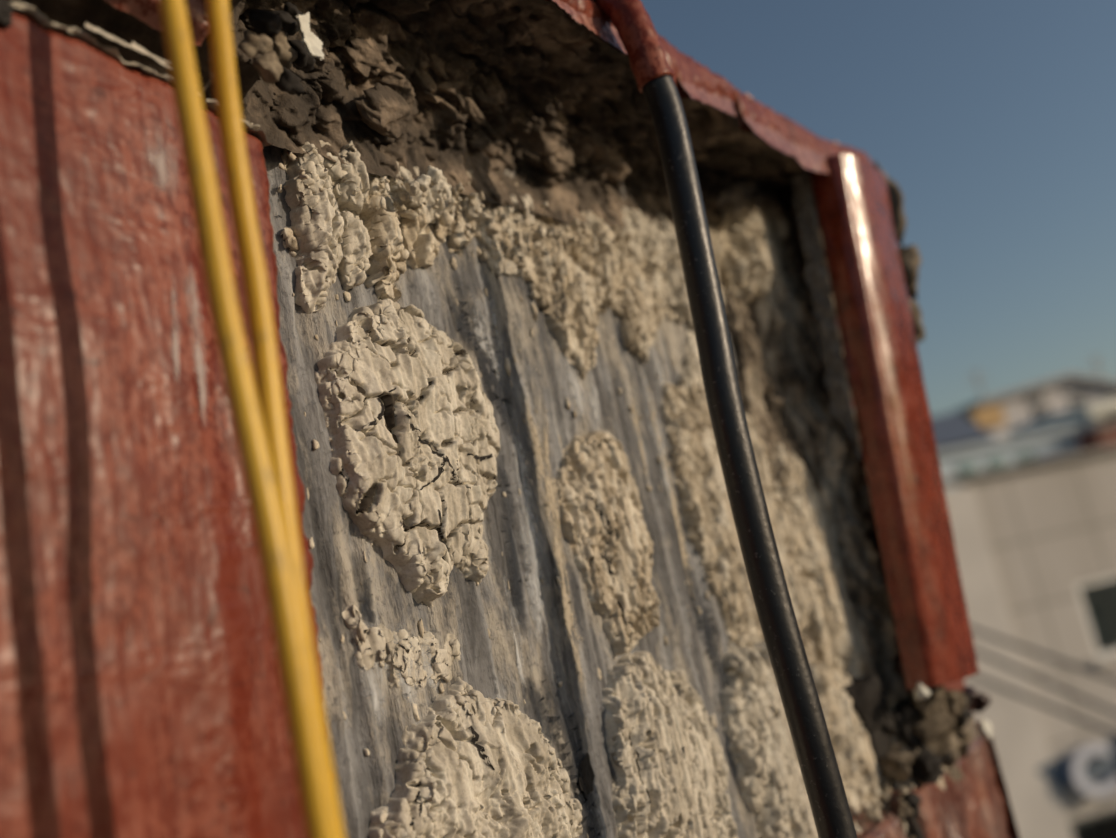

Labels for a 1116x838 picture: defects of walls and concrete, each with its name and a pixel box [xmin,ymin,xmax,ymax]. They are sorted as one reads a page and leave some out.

peeling [229,0,411,140]
spalling [457,92,486,125]
spalling [541,116,595,177]
peeling [549,0,628,56]
peeling [677,76,830,175]
crack [330,349,497,561]
spalling [841,672,992,789]